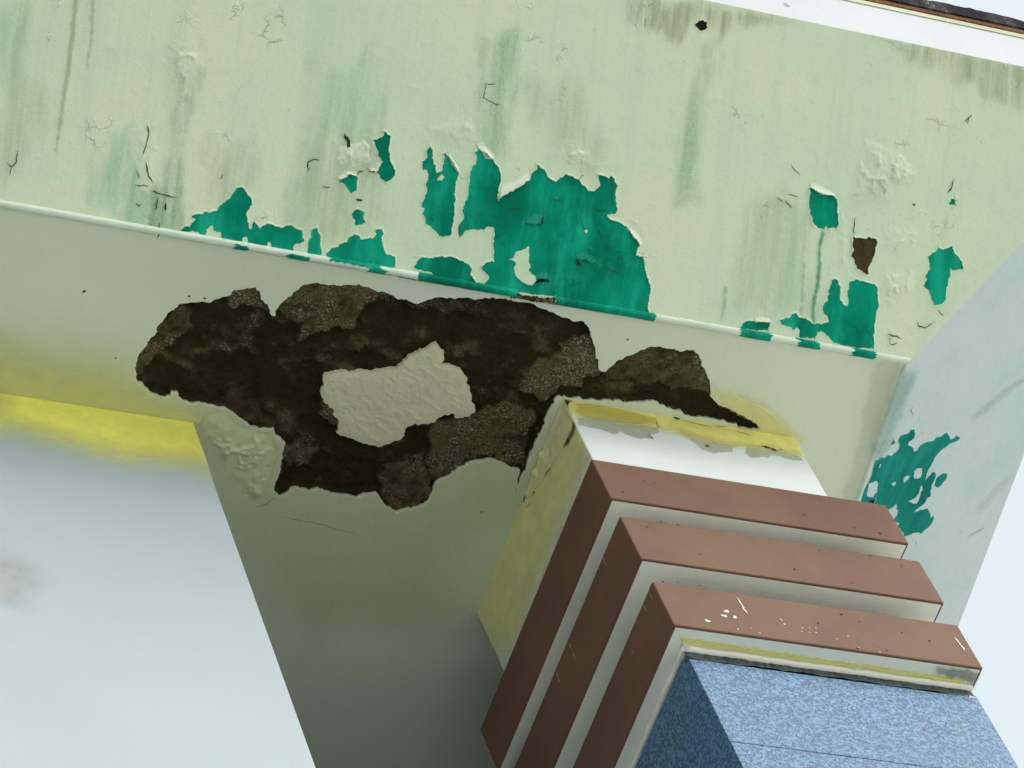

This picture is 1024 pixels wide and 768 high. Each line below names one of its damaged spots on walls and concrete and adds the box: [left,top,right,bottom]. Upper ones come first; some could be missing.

peeling [806,183,841,233]
peeling [947,193,958,207]
spalling [135,129,759,512]
peeling [739,234,881,359]
peeling [922,244,965,307]
leakage [477,395,804,641]
peeling [678,431,804,462]
peeling [860,427,961,538]